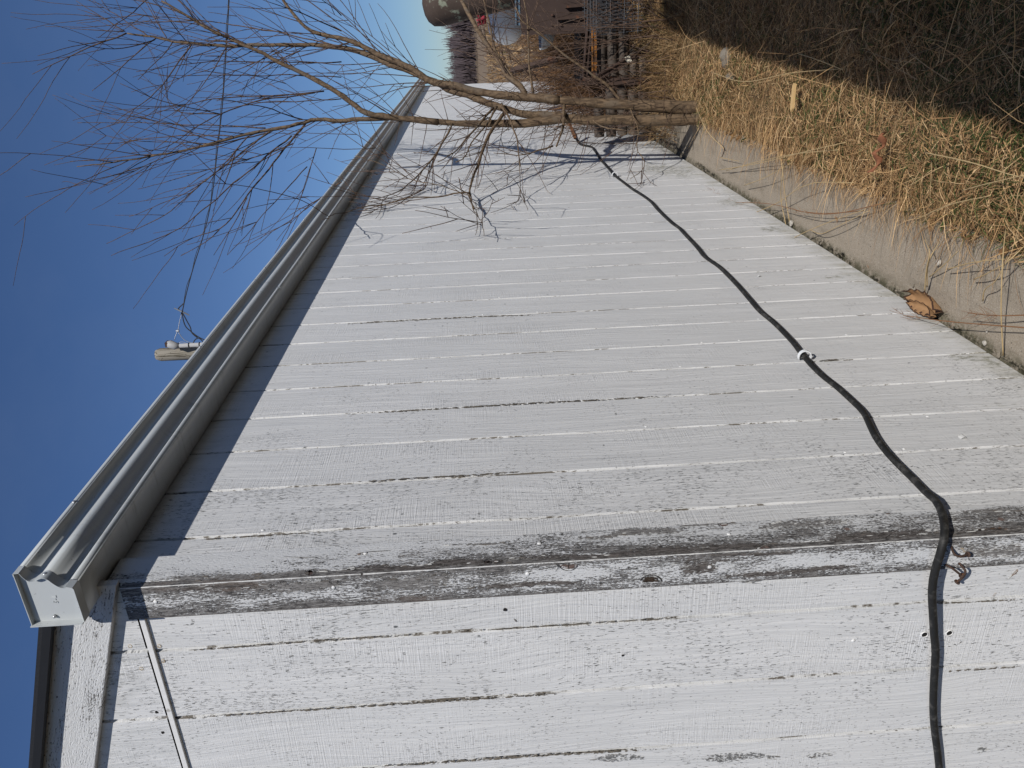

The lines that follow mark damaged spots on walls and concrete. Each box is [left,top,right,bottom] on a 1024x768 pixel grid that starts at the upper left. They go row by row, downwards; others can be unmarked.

peeling [156,519,1023,597]